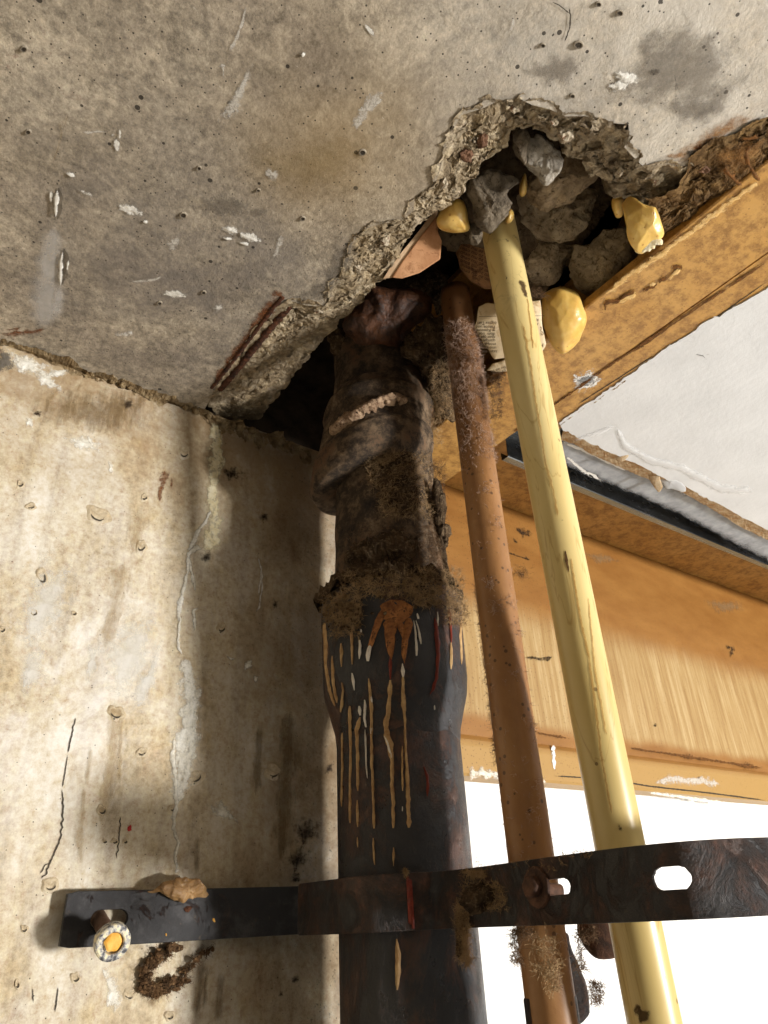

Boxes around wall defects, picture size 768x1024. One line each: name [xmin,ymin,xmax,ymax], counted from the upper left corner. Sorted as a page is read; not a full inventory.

damp [640,30,727,118]
corrosion [216,291,282,376]
spalling [207,92,768,421]
damp [169,424,242,872]
crack [40,718,76,878]